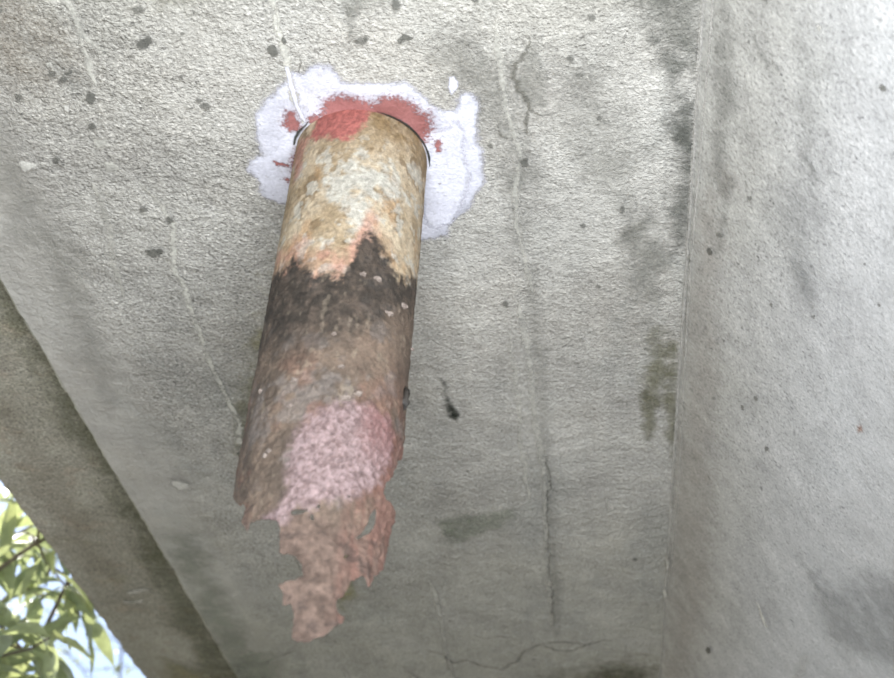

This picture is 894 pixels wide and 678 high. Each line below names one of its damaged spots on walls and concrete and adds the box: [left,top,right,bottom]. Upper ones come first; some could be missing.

crack [512,41,542,135]